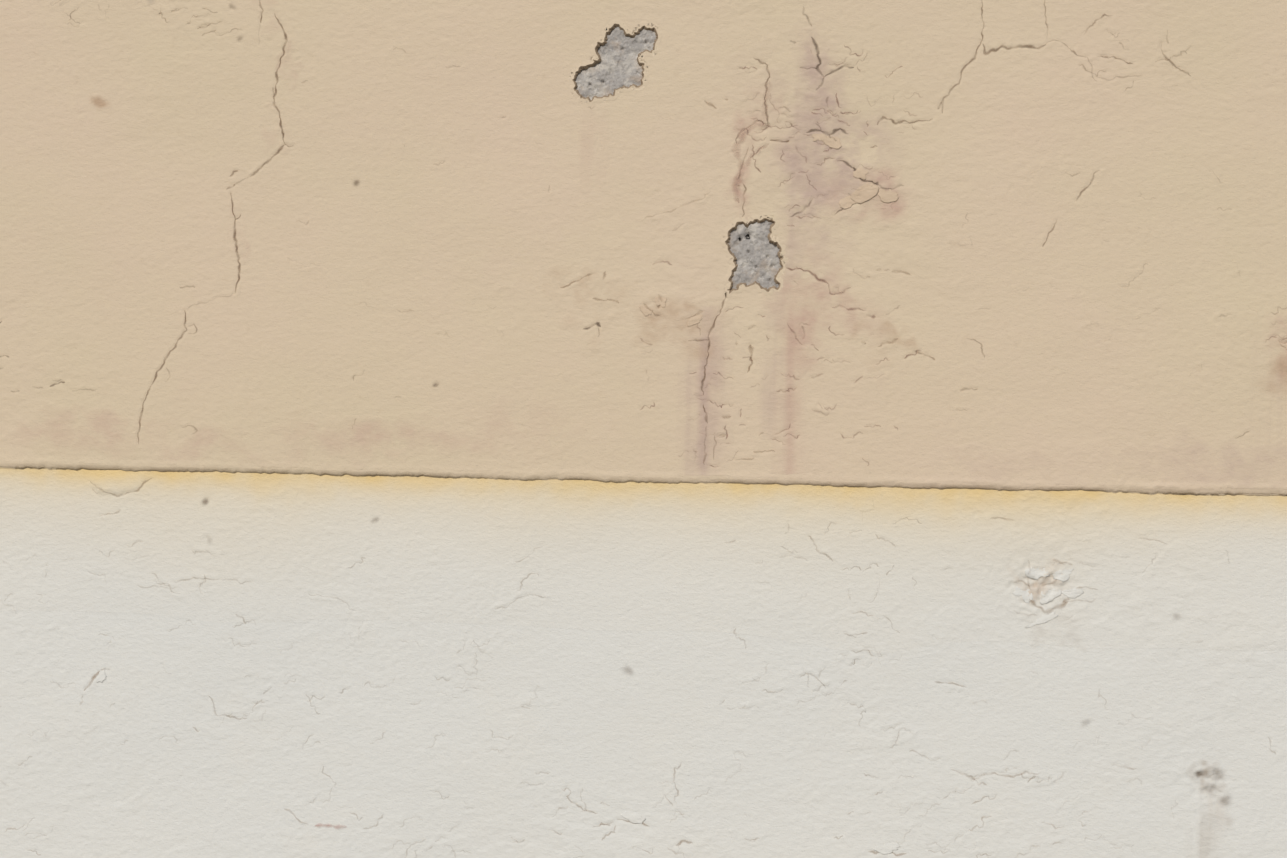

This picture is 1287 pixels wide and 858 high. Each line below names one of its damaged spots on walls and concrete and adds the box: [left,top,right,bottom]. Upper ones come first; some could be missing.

spalling [568,19,663,105]
crack [757,38,878,184]
crack [232,184,241,285]
spalling [720,214,788,298]
damp [0,0,1287,653]
spalling [1005,558,1089,653]